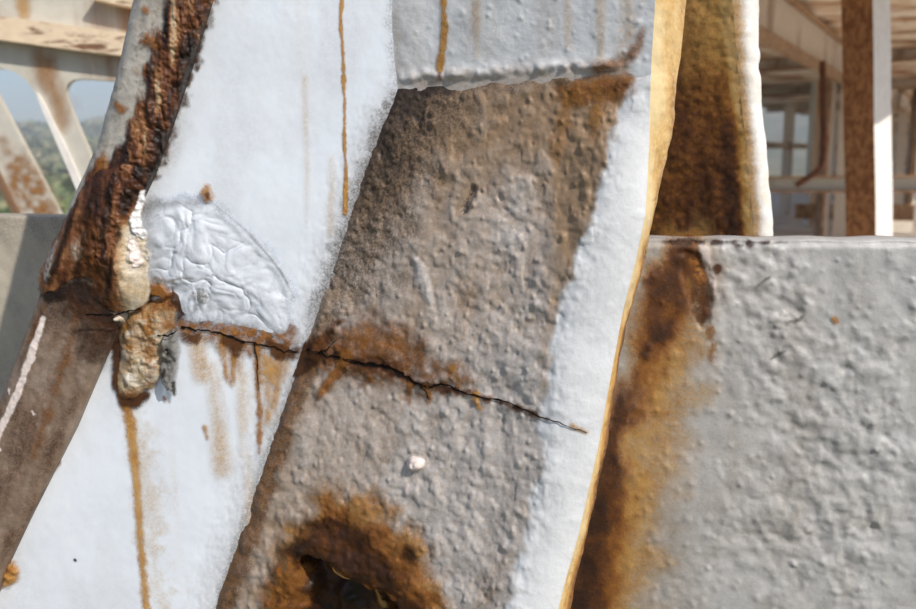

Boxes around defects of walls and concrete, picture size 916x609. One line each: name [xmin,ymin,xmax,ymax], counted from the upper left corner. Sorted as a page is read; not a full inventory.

rust [436,0,448,81]
rust [339,0,348,215]
peeling [127,190,147,267]
rust [201,185,213,202]
rust [85,282,548,609]
crack [181,326,586,433]
rust [571,232,781,609]